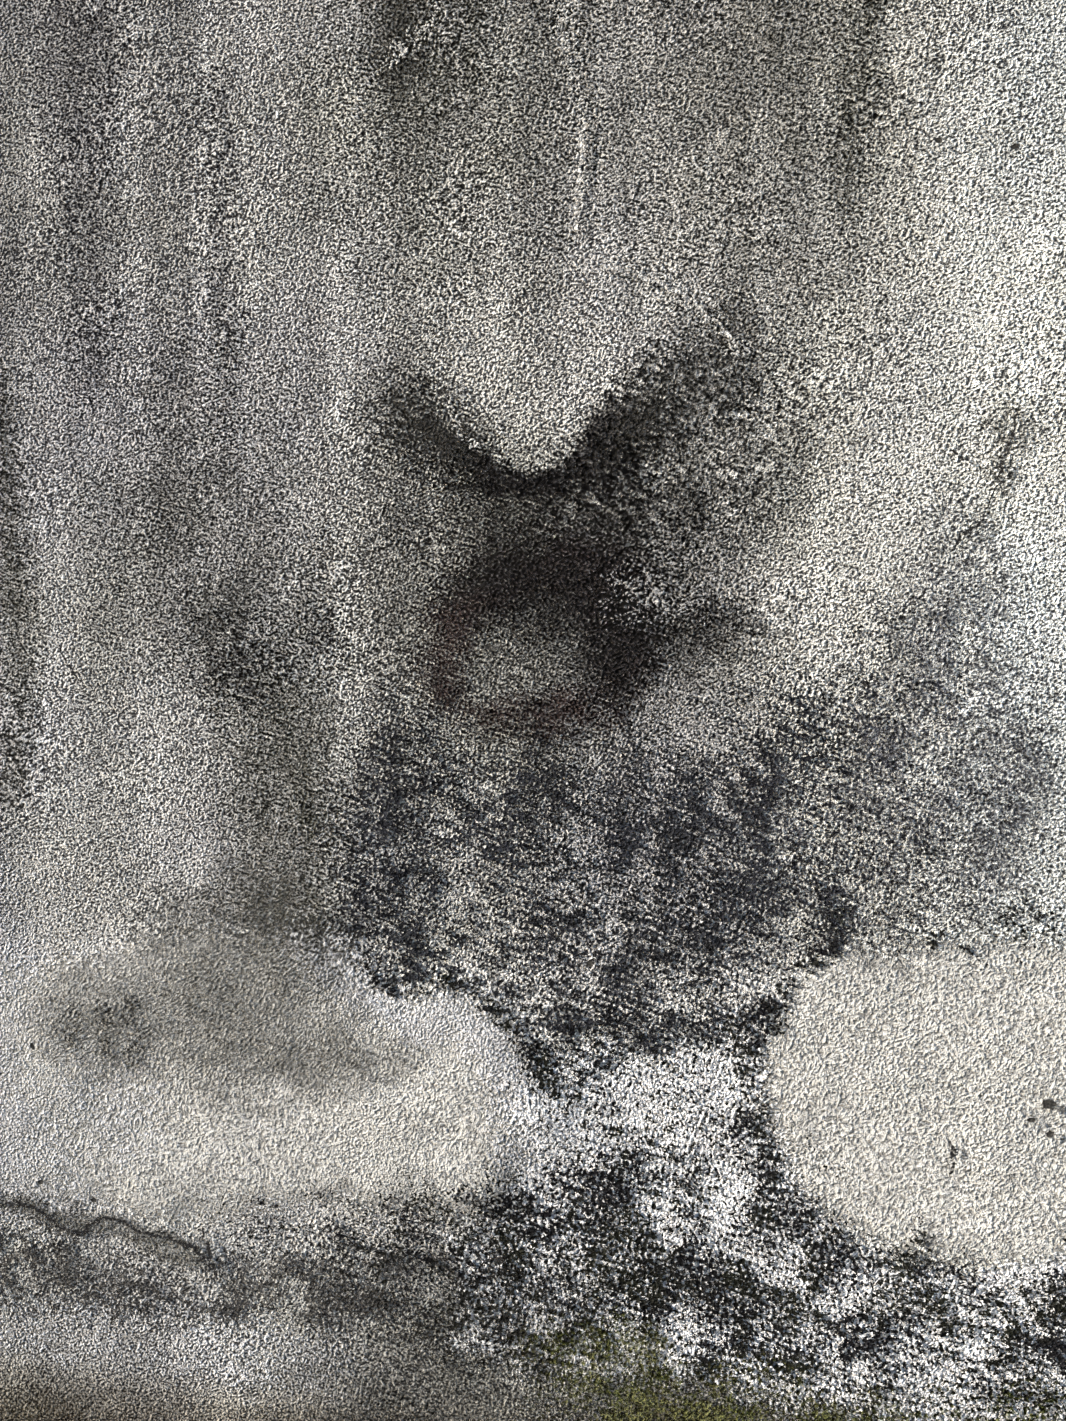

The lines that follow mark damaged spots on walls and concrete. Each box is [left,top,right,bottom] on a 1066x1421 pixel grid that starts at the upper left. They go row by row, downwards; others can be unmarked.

water stain [980,395,1042,495]
crack [0,1195,218,1280]